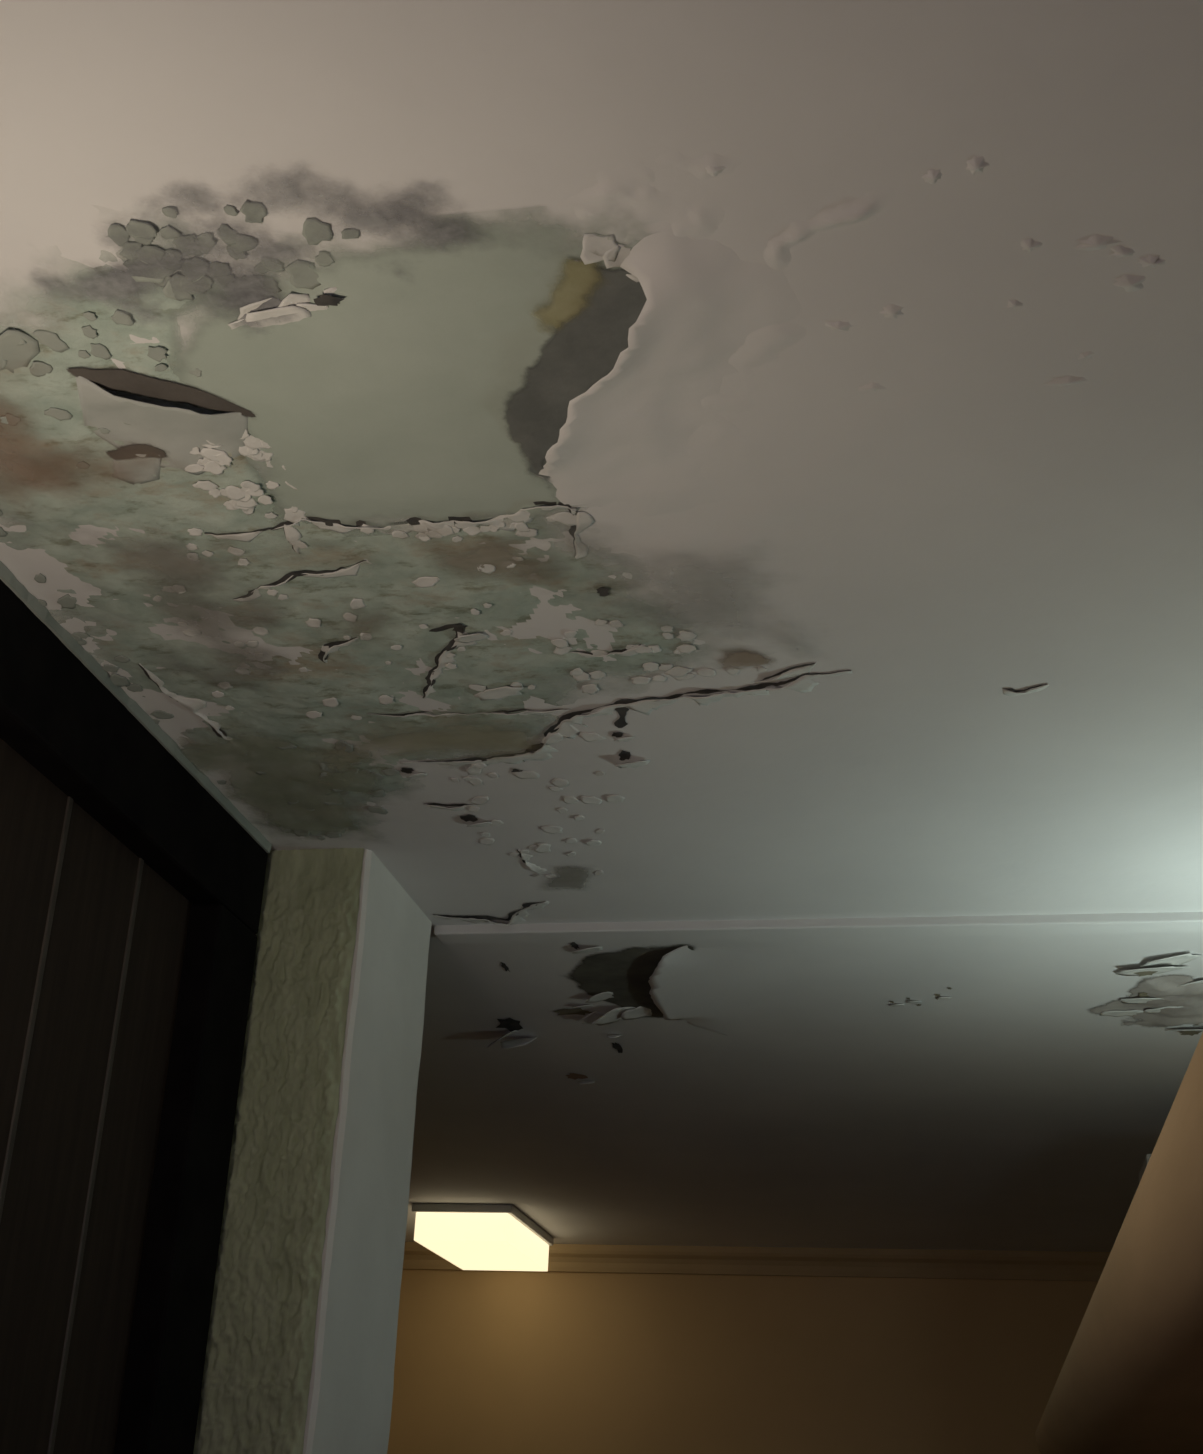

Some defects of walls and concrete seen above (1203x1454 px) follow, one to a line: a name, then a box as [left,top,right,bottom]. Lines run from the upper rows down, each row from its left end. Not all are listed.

water stain [265,178,469,247]
peeling [0,201,801,543]
peeling [186,528,251,566]
water stain [0,192,691,835]
crack [205,501,595,602]
peeling [477,556,524,574]
peeling [305,598,372,652]
crack [367,624,853,766]
crack [424,803,476,811]
peeling [553,942,803,1053]
peeling [1090,953,1203,1036]